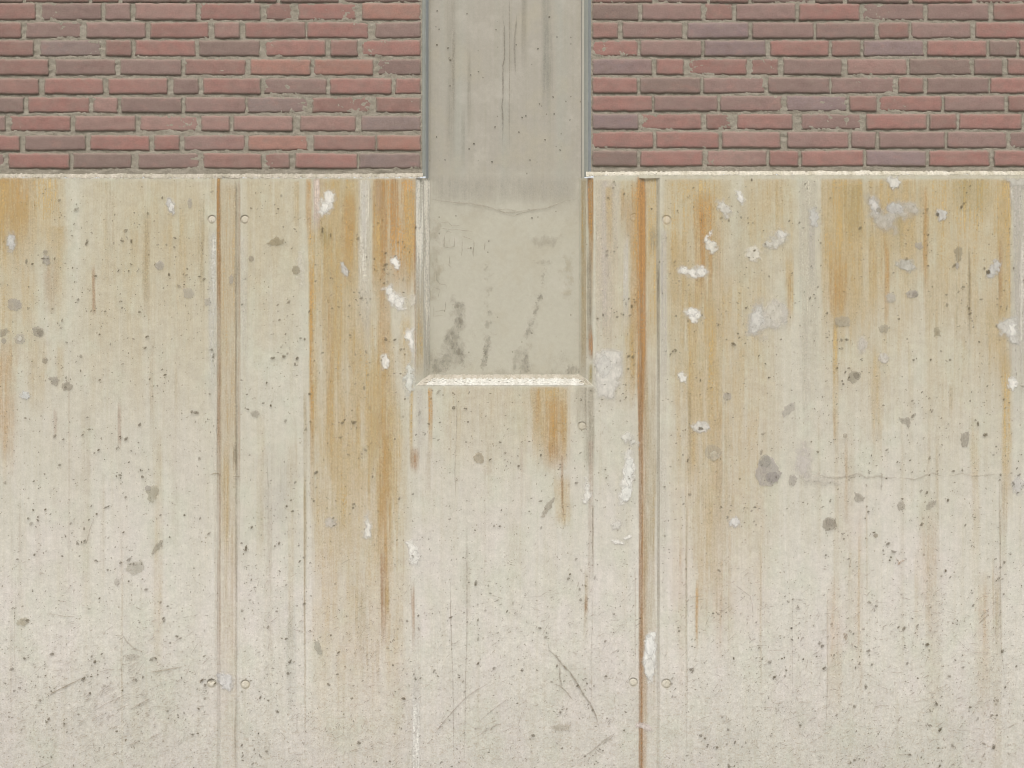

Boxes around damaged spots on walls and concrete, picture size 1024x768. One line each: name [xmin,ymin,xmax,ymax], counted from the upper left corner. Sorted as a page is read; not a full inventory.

corrosion [373,180,415,273]
peeling [869,176,918,230]
corrosion [308,180,353,419]
peeling [381,286,415,310]
corrosion [627,179,656,459]
peeling [997,317,1019,344]
peeling [595,350,622,398]
peeling [618,432,635,504]
peeling [643,632,657,683]